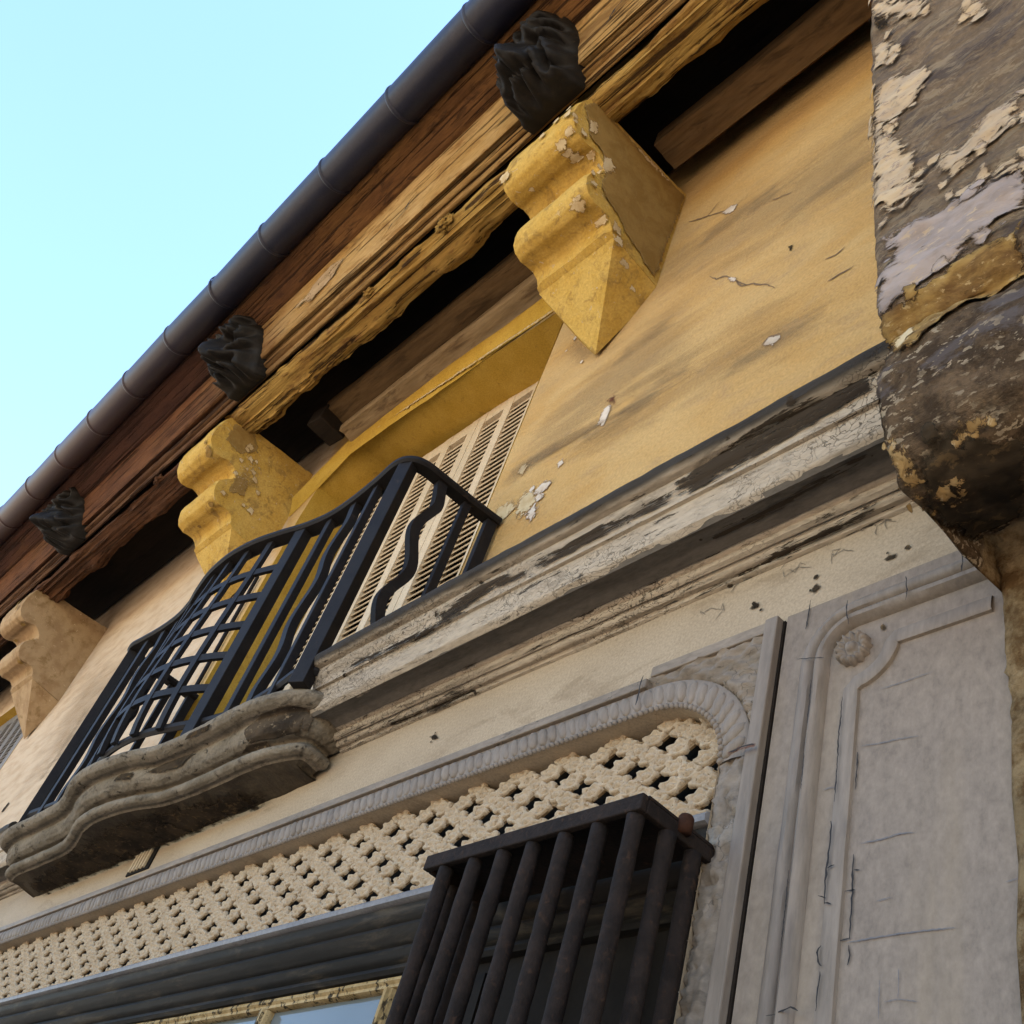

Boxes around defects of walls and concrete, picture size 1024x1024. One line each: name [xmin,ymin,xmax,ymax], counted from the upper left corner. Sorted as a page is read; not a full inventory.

peeling [553,99,684,276]
peeling [868,0,1024,353]
crack [710,275,774,288]
peeling [393,310,553,417]
spalling [761,333,781,347]
peeling [208,415,260,515]
peeling [951,415,997,449]
peeling [342,369,878,677]
peeling [388,685,482,725]